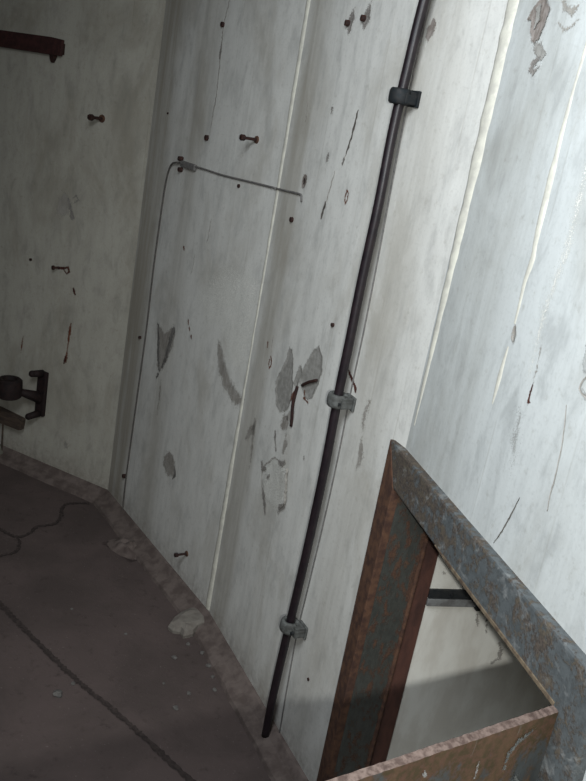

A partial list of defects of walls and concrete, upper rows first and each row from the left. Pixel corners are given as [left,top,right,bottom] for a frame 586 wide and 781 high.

spalling [527,0,551,75]
spalling [156,324,175,415]
spalling [275,345,322,431]
spalling [578,345,586,400]
spalling [163,452,176,479]
crack [0,502,89,557]
corrosion [434,545,555,706]